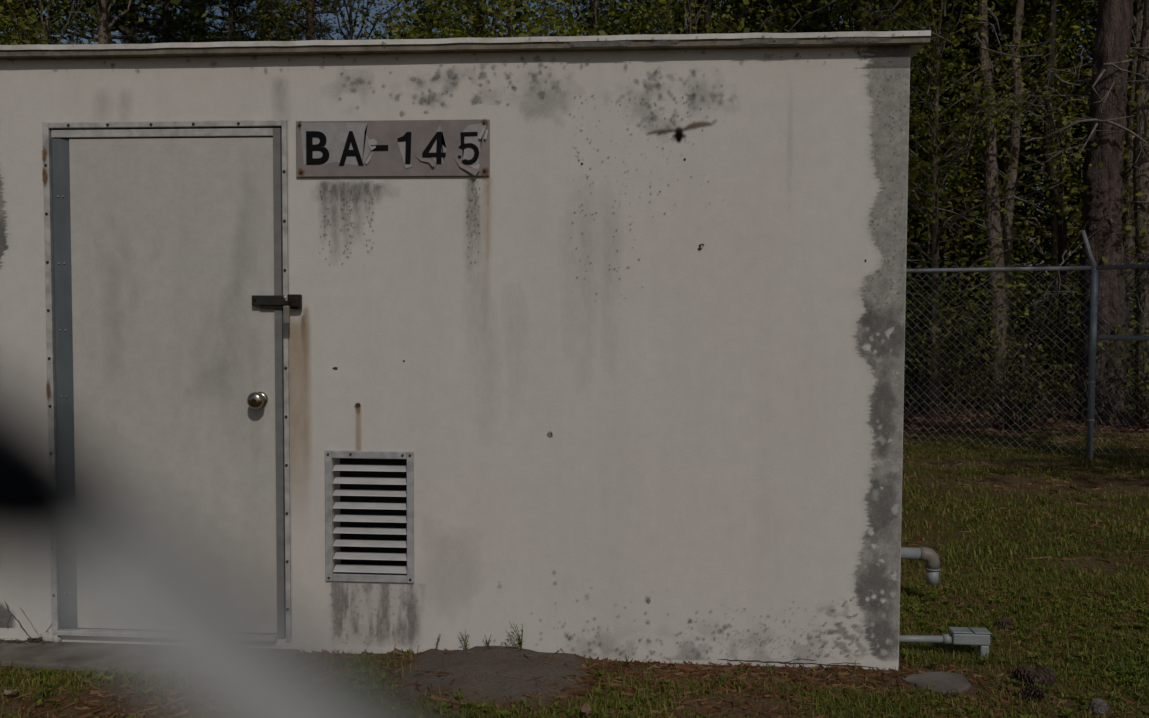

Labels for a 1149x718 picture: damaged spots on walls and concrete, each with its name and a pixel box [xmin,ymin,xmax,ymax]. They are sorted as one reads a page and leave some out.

water stain [556,39,631,47]
water stain [740,35,799,57]
water stain [0,216,8,263]
water stain [816,35,910,659]
water stain [0,605,13,628]
water stain [332,581,356,632]
water stain [366,582,416,642]